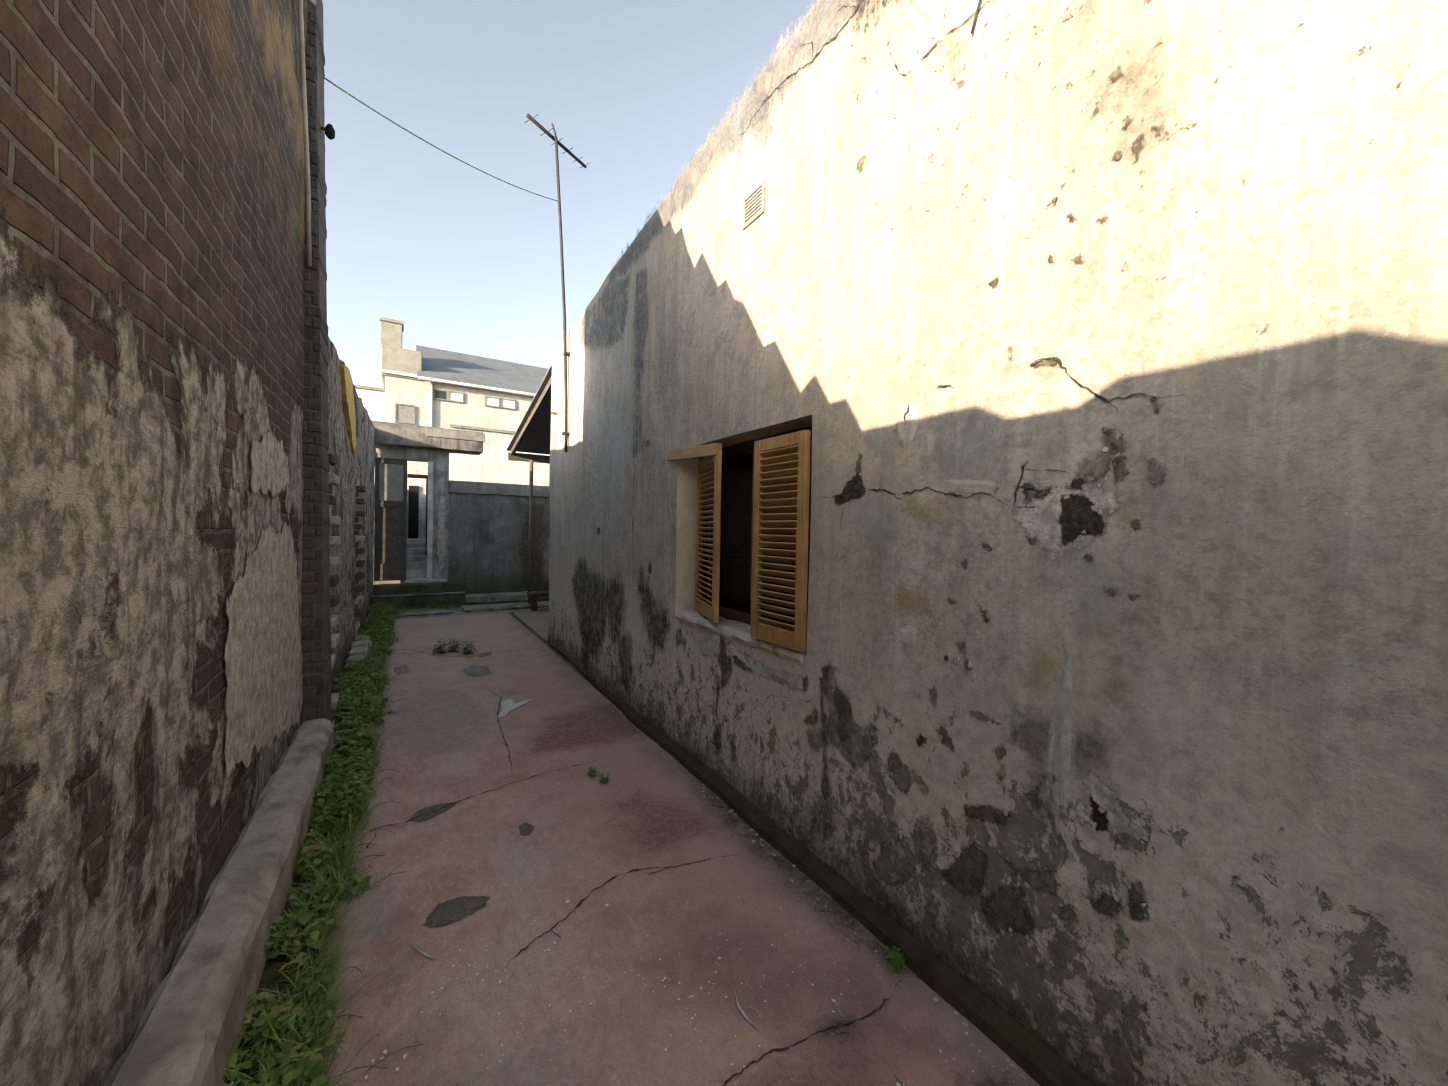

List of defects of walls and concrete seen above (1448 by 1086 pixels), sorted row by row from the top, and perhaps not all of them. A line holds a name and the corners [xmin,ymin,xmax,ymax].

crack [731,5,860,143]
crack [1025,357,1184,410]
crack [822,462,1066,527]
peeling [1013,428,1129,563]
water stain [572,559,670,693]
water stain [713,636,732,751]
peeling [409,802,456,822]
water stain [804,678,833,837]
peeling [1077,770,1149,852]
peeling [425,896,489,928]
spalling [873,800,1150,940]
crack [723,981,901,1086]